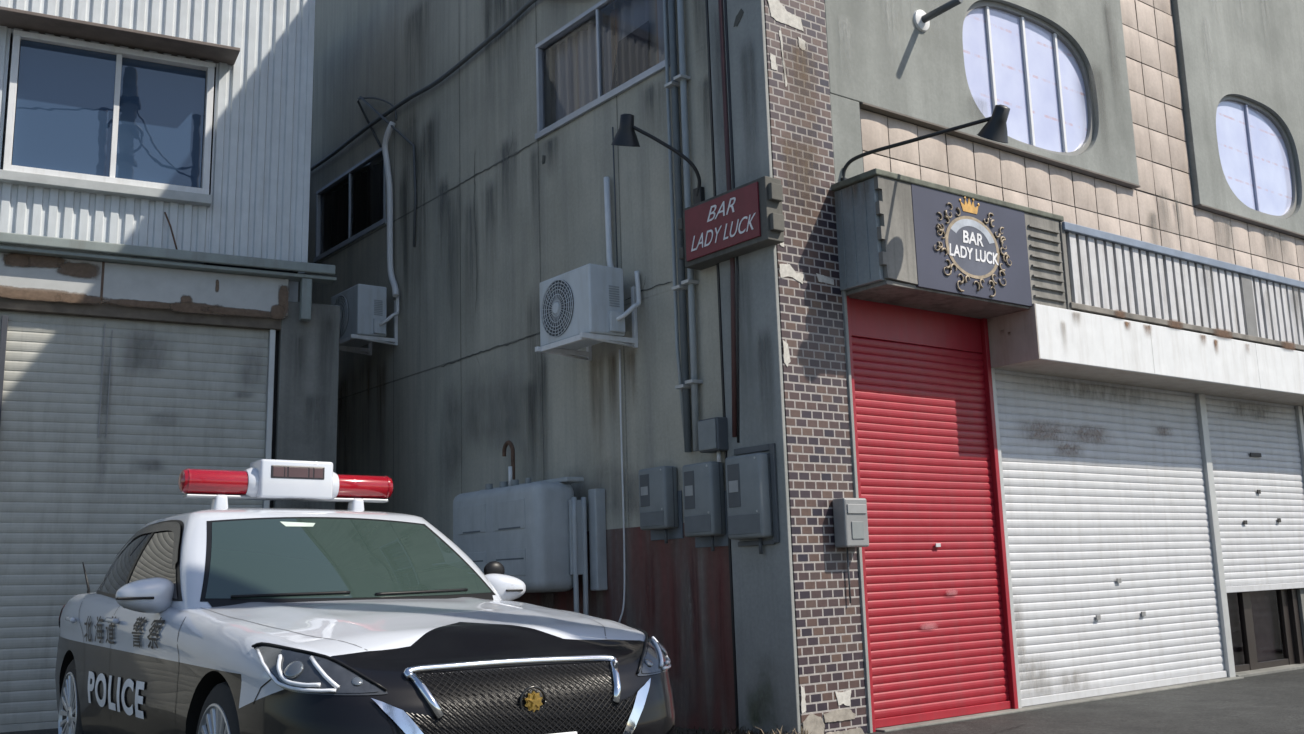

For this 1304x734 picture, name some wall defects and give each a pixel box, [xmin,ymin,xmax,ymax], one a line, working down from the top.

spalling [767,0,806,51]
peeling [0,253,271,317]